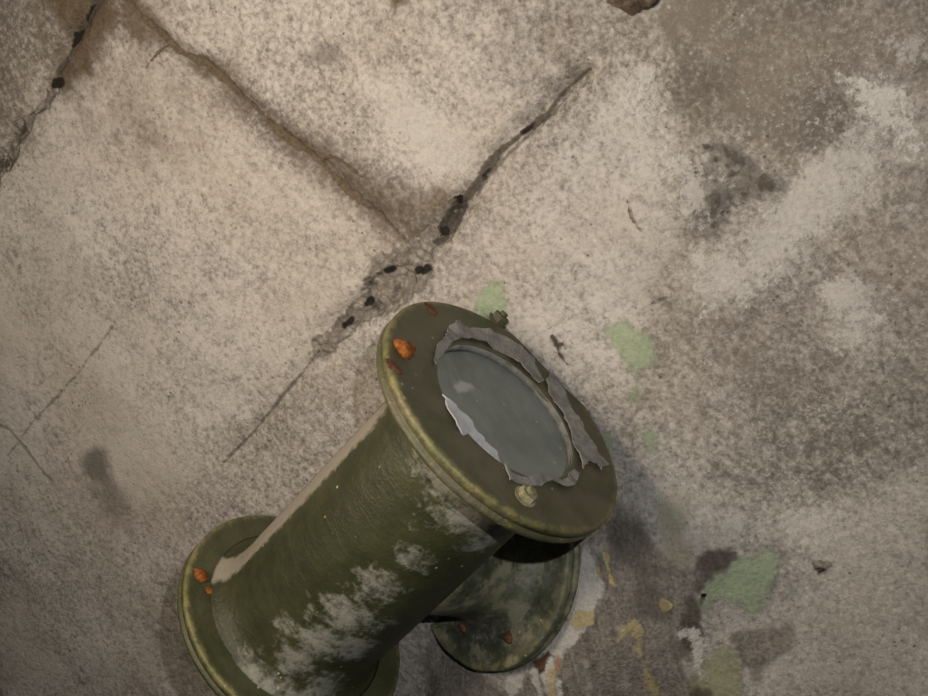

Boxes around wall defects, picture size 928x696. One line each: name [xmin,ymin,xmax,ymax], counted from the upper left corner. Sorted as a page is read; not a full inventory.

spalling [607,0,659,16]
crack [0,0,408,242]
crack [384,68,589,274]
spalling [759,174,776,192]
crack [342,296,375,329]
crack [550,335,567,365]
damp [781,502,850,549]
damp [426,504,737,696]
peeling [705,550,779,612]
damp [731,626,792,666]
peeling [693,650,740,696]